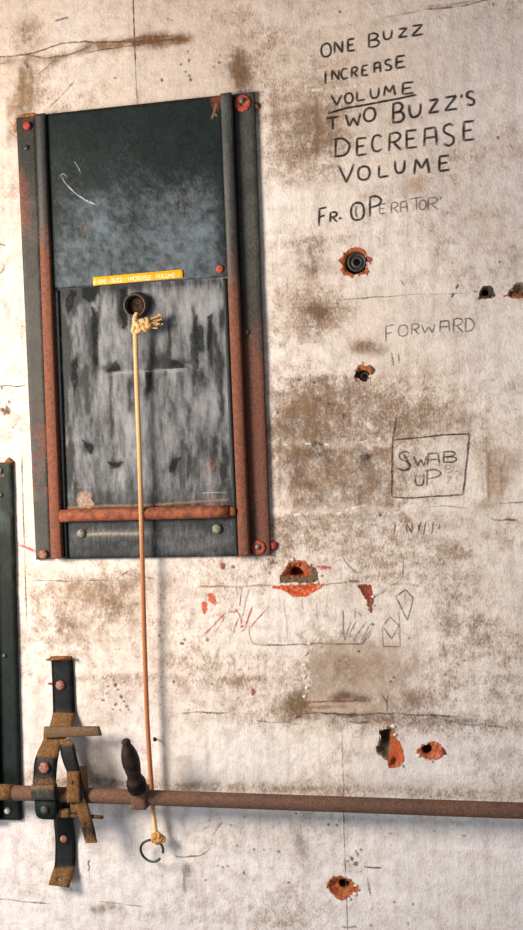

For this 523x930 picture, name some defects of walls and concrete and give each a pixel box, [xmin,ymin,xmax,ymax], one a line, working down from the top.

crack [0,0,178,93]
corrosion [118,34,190,47]
spalling [338,247,372,278]
spalling [478,282,523,300]
spalling [351,361,375,382]
spalling [269,557,331,597]
peeling [201,593,217,614]
peeling [357,584,375,625]
peeling [302,642,405,768]
spalling [415,741,447,763]
spalling [325,875,361,901]